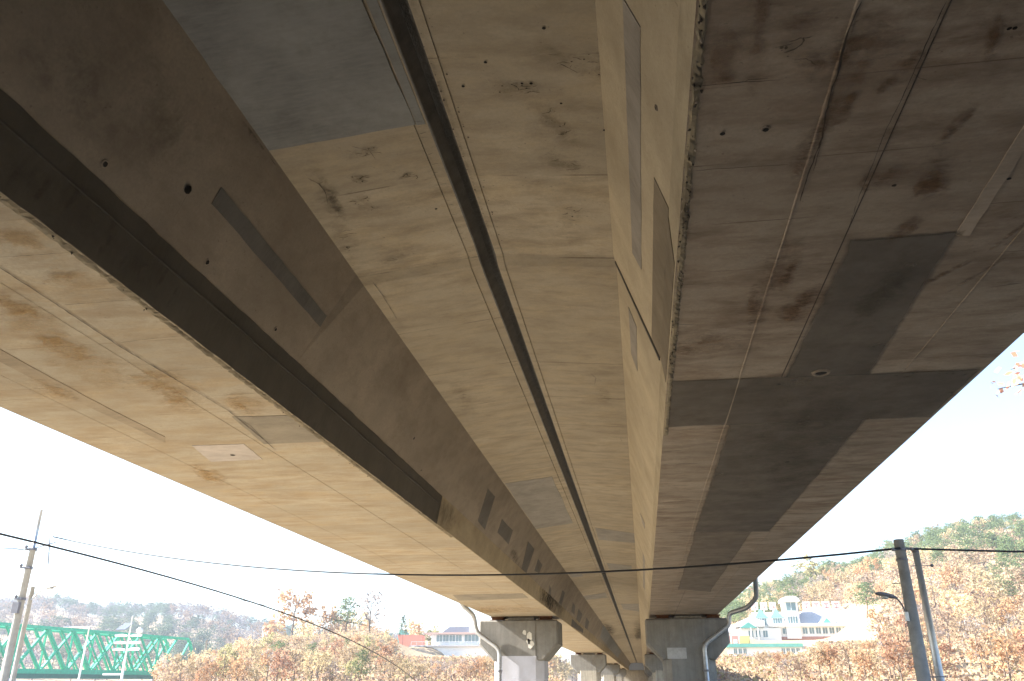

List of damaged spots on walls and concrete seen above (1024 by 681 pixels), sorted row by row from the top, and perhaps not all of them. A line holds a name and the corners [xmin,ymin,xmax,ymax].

spalling [663,0,708,436]